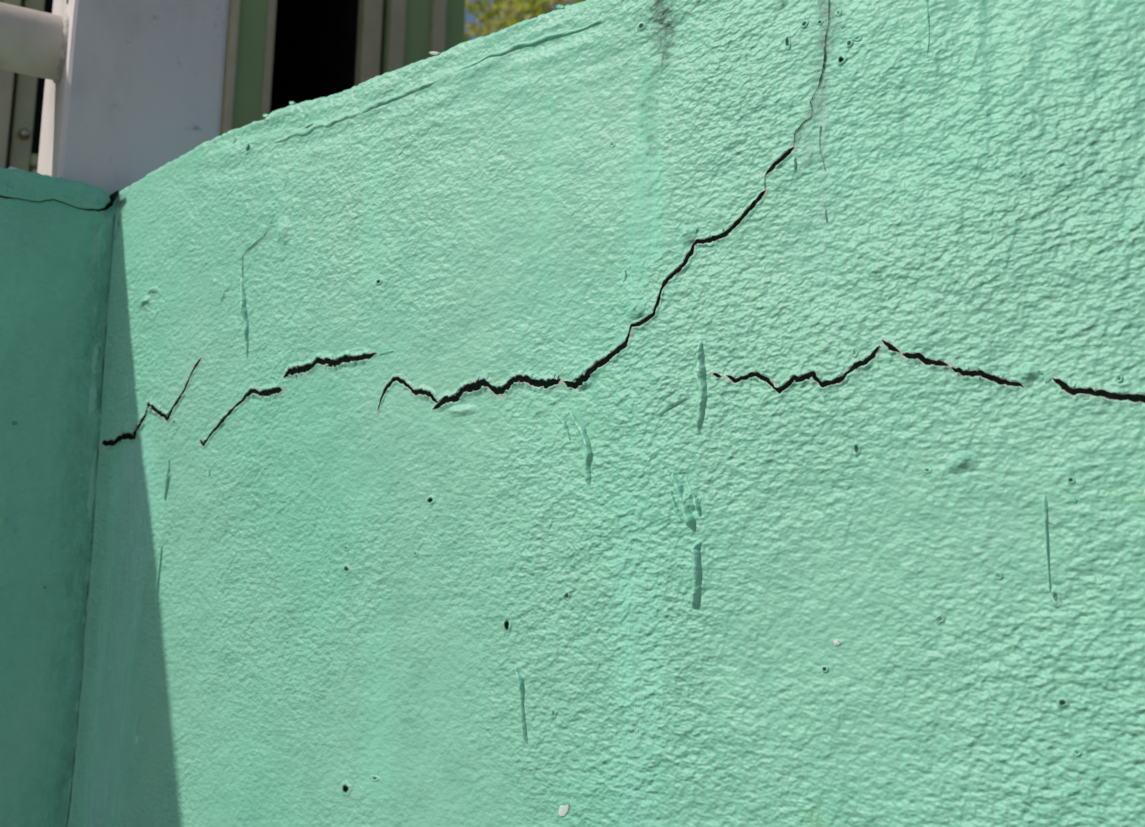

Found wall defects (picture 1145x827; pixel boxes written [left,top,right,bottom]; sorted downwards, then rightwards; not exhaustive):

crack [199,0,846,449]
crack [712,338,1145,409]